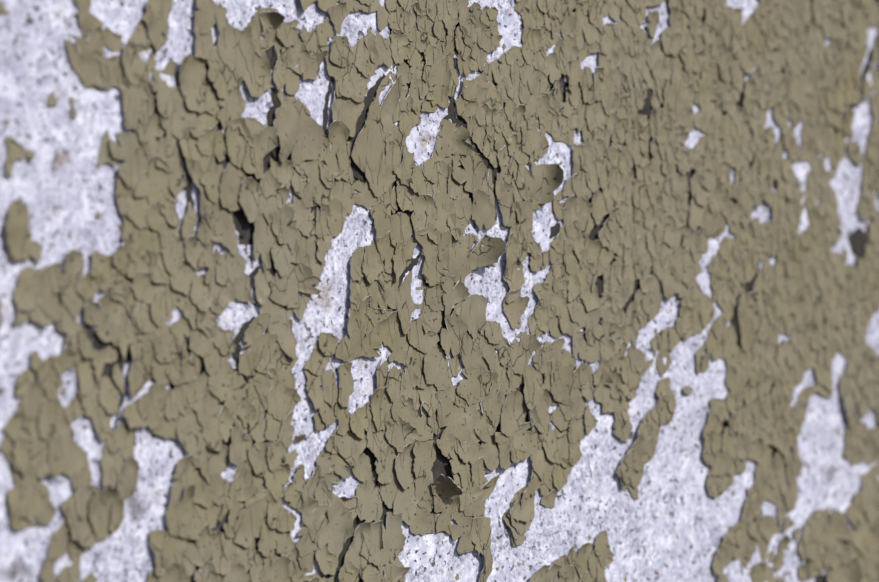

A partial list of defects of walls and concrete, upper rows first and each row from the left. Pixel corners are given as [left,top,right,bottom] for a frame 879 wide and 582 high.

crack [83,323,126,430]
crack [176,144,195,211]
crack [232,266,259,379]
crack [263,47,281,162]
crack [323,74,386,182]
crack [398,255,420,288]
flaking render [452,353,467,385]
crack [442,57,497,221]
crack [549,223,561,239]
peeling [440,0,695,377]
flaking render [684,125,706,149]
crack [847,226,867,258]